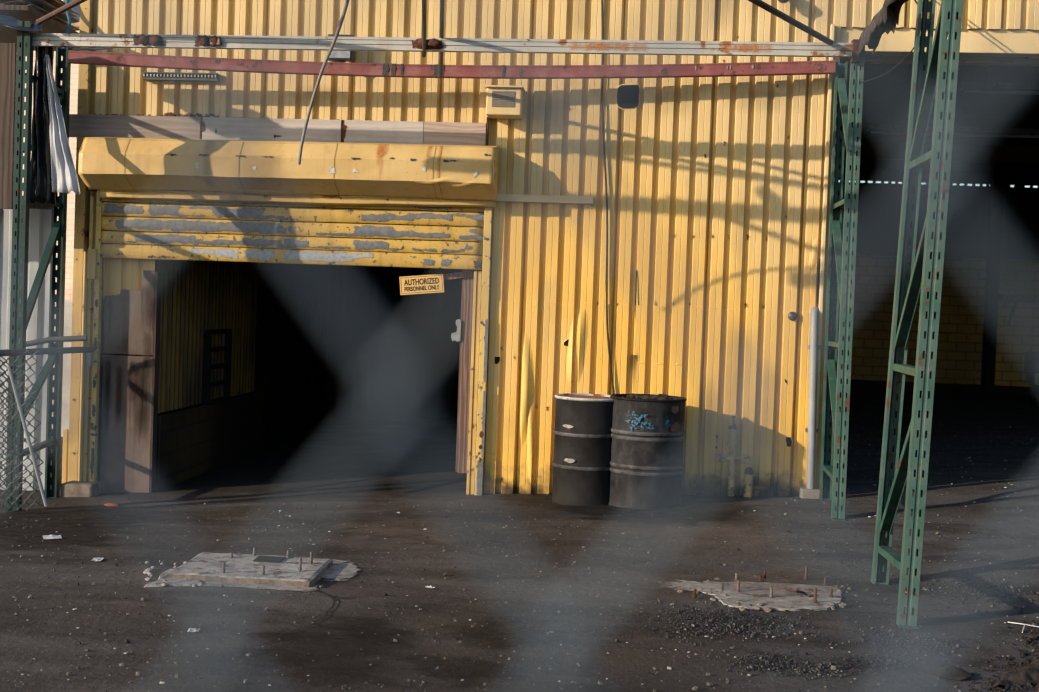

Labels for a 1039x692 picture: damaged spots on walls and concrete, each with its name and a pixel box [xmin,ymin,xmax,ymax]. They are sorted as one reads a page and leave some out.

corrosion [133,34,163,46]
corrosion [194,35,222,47]
peeling [102,198,179,243]
peeling [154,201,296,261]
peeling [303,206,484,268]
leakage [105,340,153,428]